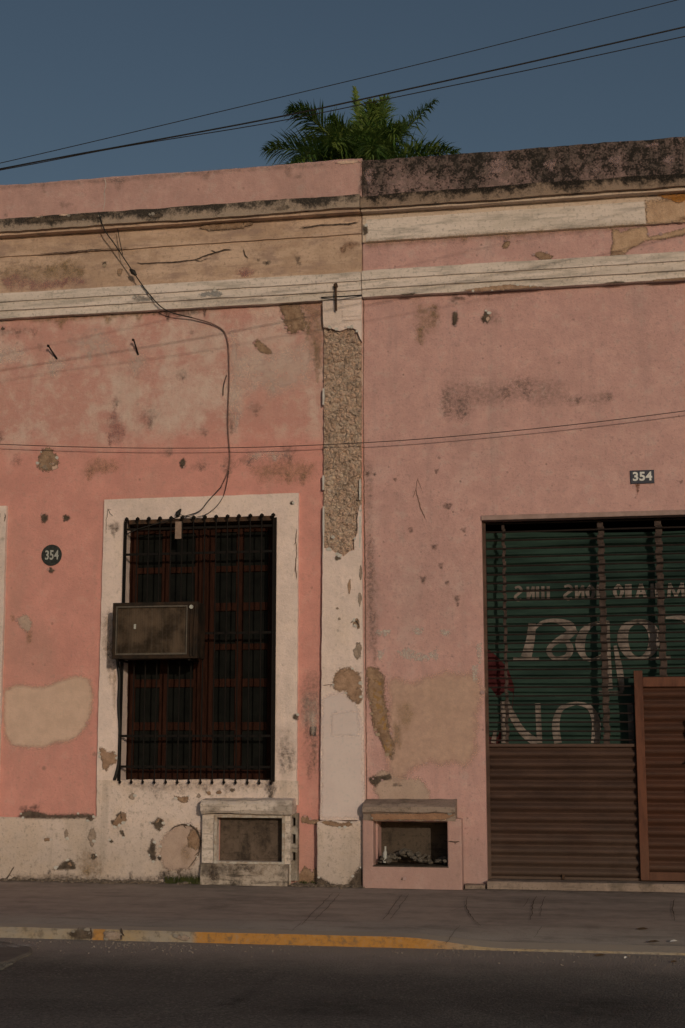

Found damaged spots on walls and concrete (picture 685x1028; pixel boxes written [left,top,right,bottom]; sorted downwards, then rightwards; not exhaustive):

peeling [611,199,685,255]
flaking render [252,338,272,354]
flaking render [36,447,59,473]
flaking render [322,325,362,560]
peeling [336,565,362,628]
flaking render [332,642,395,761]
flaking render [98,746,118,771]
peeling [19,806,127,859]